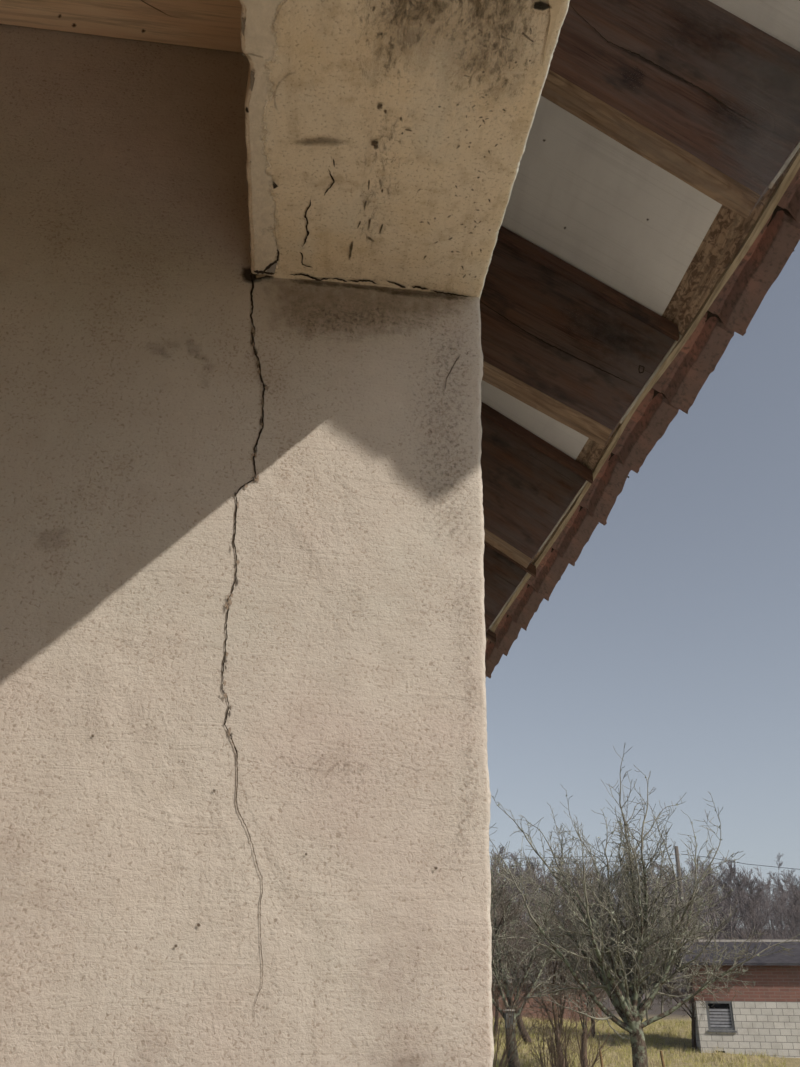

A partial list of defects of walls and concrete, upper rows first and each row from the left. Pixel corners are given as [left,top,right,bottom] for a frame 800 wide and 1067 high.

crack [290,159,633,385]
crack [222,282,269,1006]